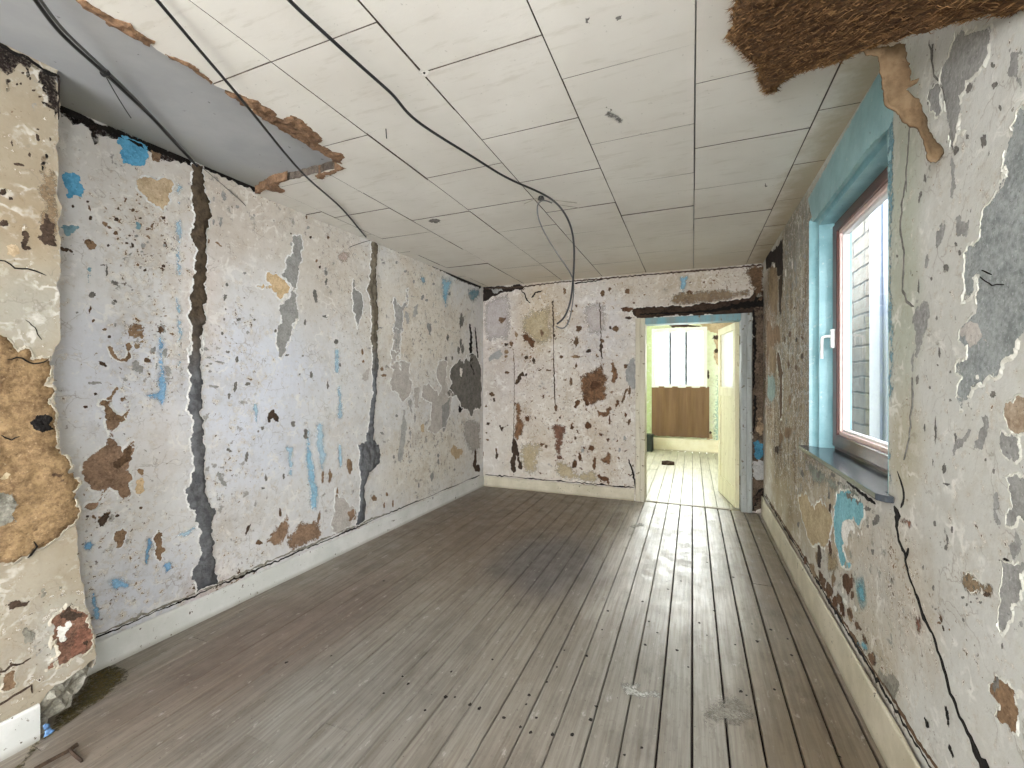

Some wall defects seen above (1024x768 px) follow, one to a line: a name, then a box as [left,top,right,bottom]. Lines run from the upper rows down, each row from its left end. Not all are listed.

flaking render [5,586,62,613]
flaking render [0,603,96,735]
spalling [0,335,145,566]
peeling [274,215,328,360]
crack [95,459,635,639]
peeling [361,261,556,463]
peeling [560,326,591,386]
peeling [801,465,880,549]
crack [899,128,914,307]
crack [893,378,990,768]
peeling [911,22,1024,649]
flaking render [988,673,1020,737]